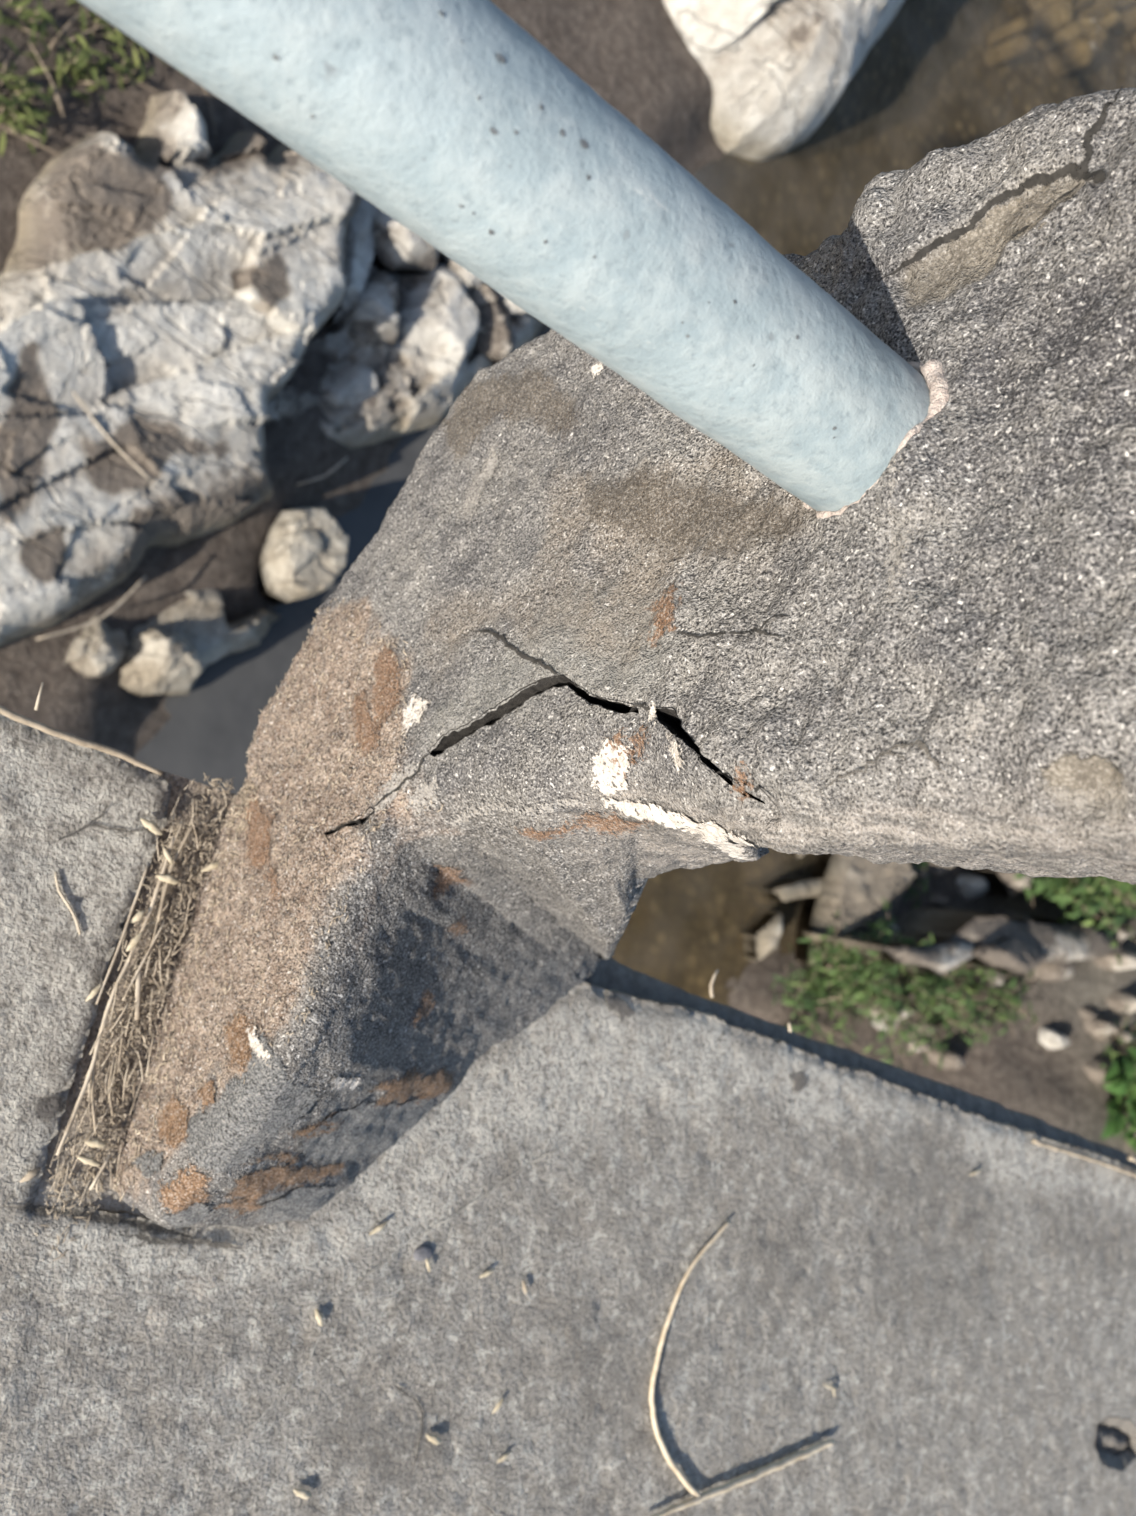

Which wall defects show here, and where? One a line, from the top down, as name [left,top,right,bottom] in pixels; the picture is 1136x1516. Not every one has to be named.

crack [884,86,1124,277]
crack [325,629,774,835]
rust [156,1081,347,1218]
rust [369,1065,455,1109]